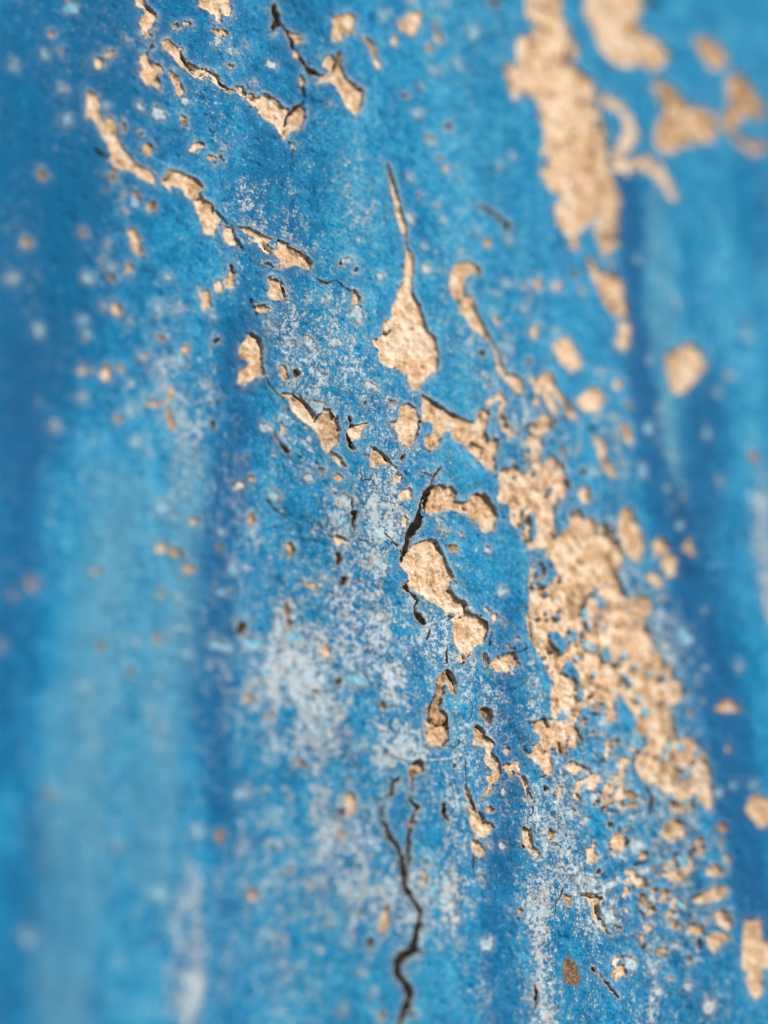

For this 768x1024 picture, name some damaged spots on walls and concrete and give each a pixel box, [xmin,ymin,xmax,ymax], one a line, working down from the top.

peeling [86,92,311,313]
peeling [135,0,380,148]
peeling [504,0,768,350]
crack [266,467,448,664]
peeling [278,165,768,999]
crack [379,681,481,1024]